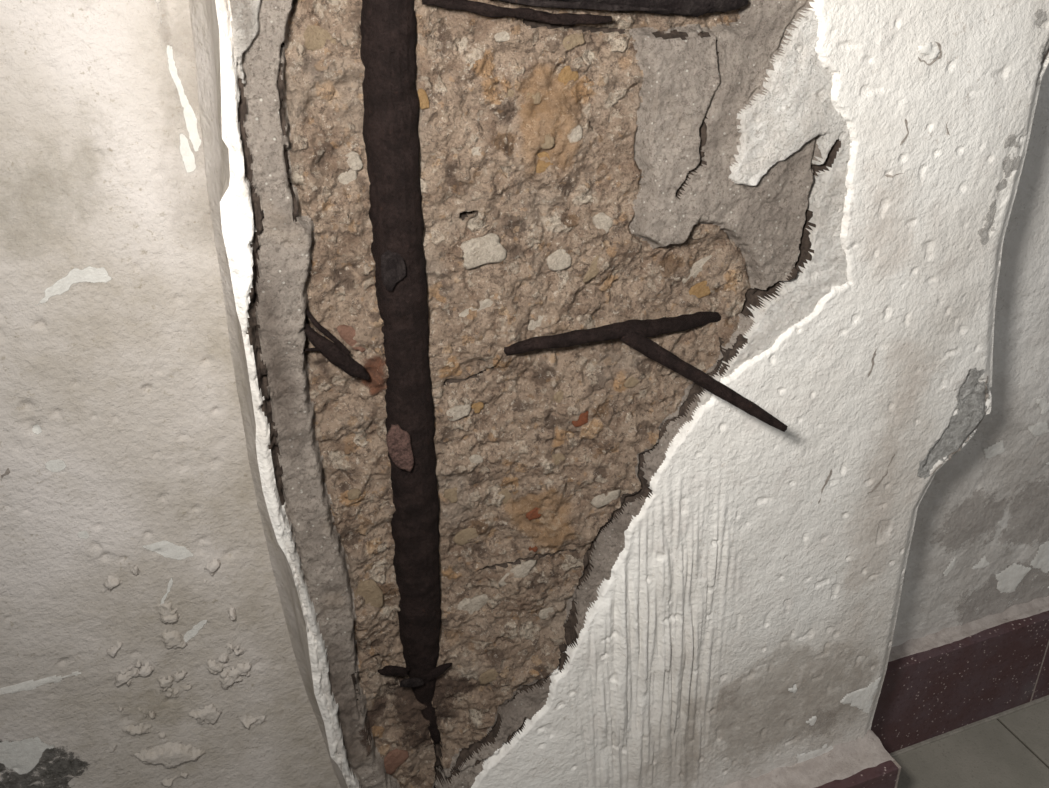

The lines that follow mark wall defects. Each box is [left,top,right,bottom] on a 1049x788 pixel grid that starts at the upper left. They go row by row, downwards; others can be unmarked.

rust [422,0,676,25]
rust [305,307,350,355]
spalling [230,0,852,788]
rust [386,424,414,472]
rust [359,663,480,757]
leakage [0,736,90,788]